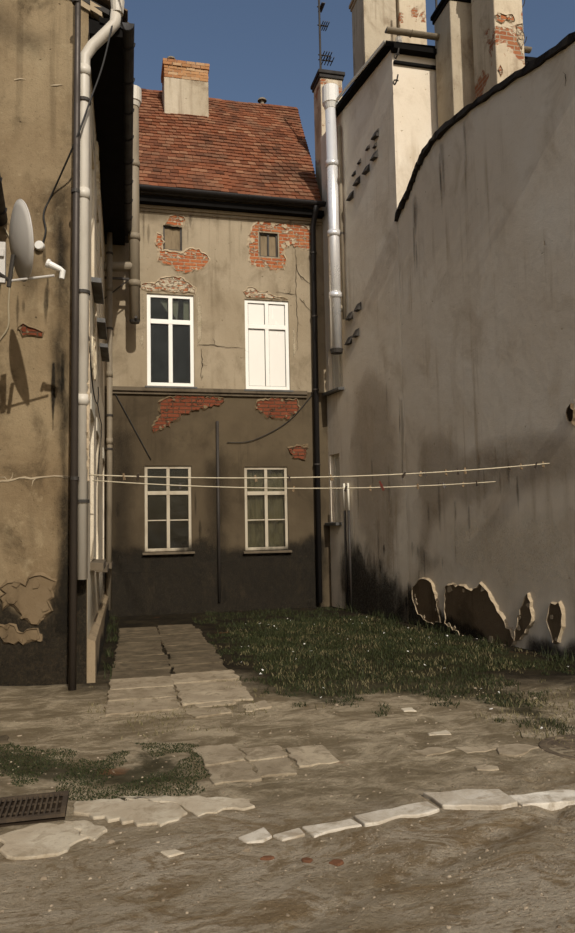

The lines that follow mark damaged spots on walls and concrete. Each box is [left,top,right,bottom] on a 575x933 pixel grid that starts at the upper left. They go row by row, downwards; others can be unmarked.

flaking render [494,12,525,50]
flaking render [140,214,211,295]
flaking render [246,220,311,273]
flaking render [0,572,59,646]
damp [341,546,486,640]
flaking render [412,577,535,646]
damp [527,638,575,661]
flaking render [546,601,566,644]